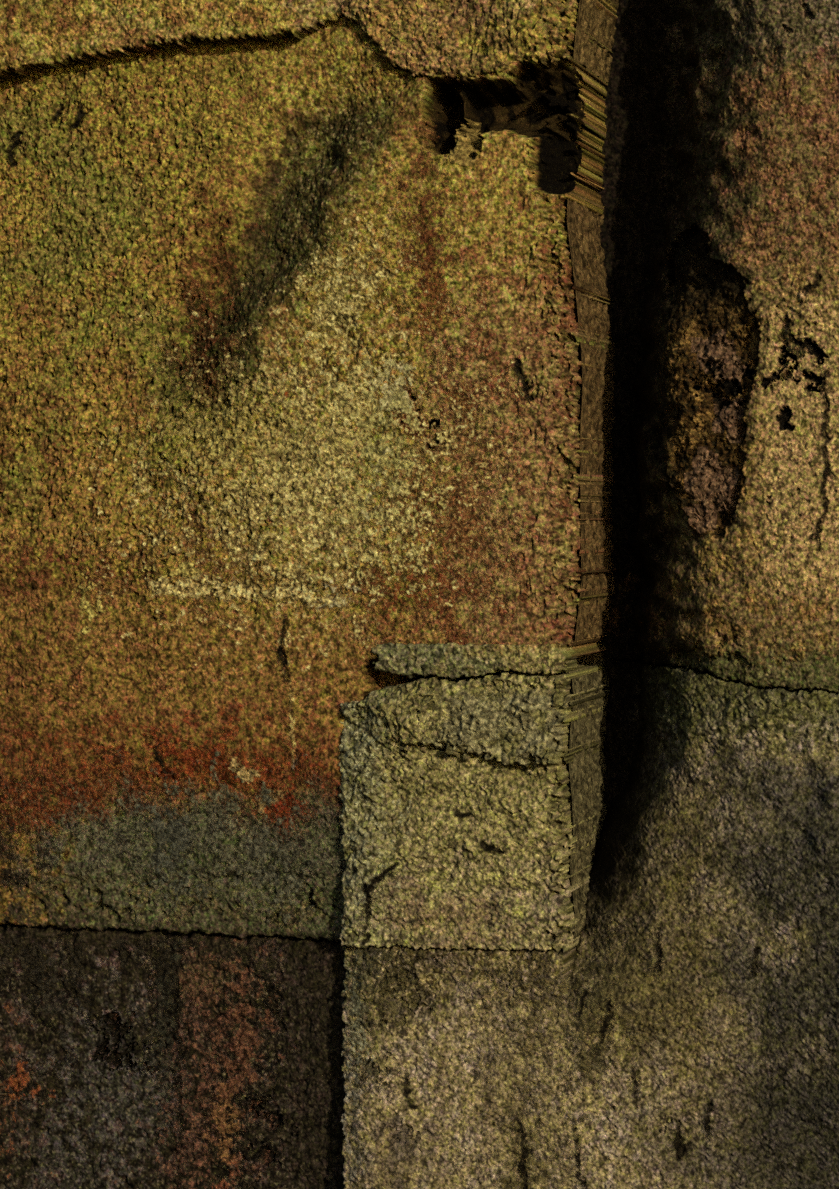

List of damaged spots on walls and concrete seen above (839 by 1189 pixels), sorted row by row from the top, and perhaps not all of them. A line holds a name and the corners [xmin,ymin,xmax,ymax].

spalling [430,65,586,195]
rust [0,698,343,846]
rust [0,1046,55,1156]
rust [146,947,279,1189]